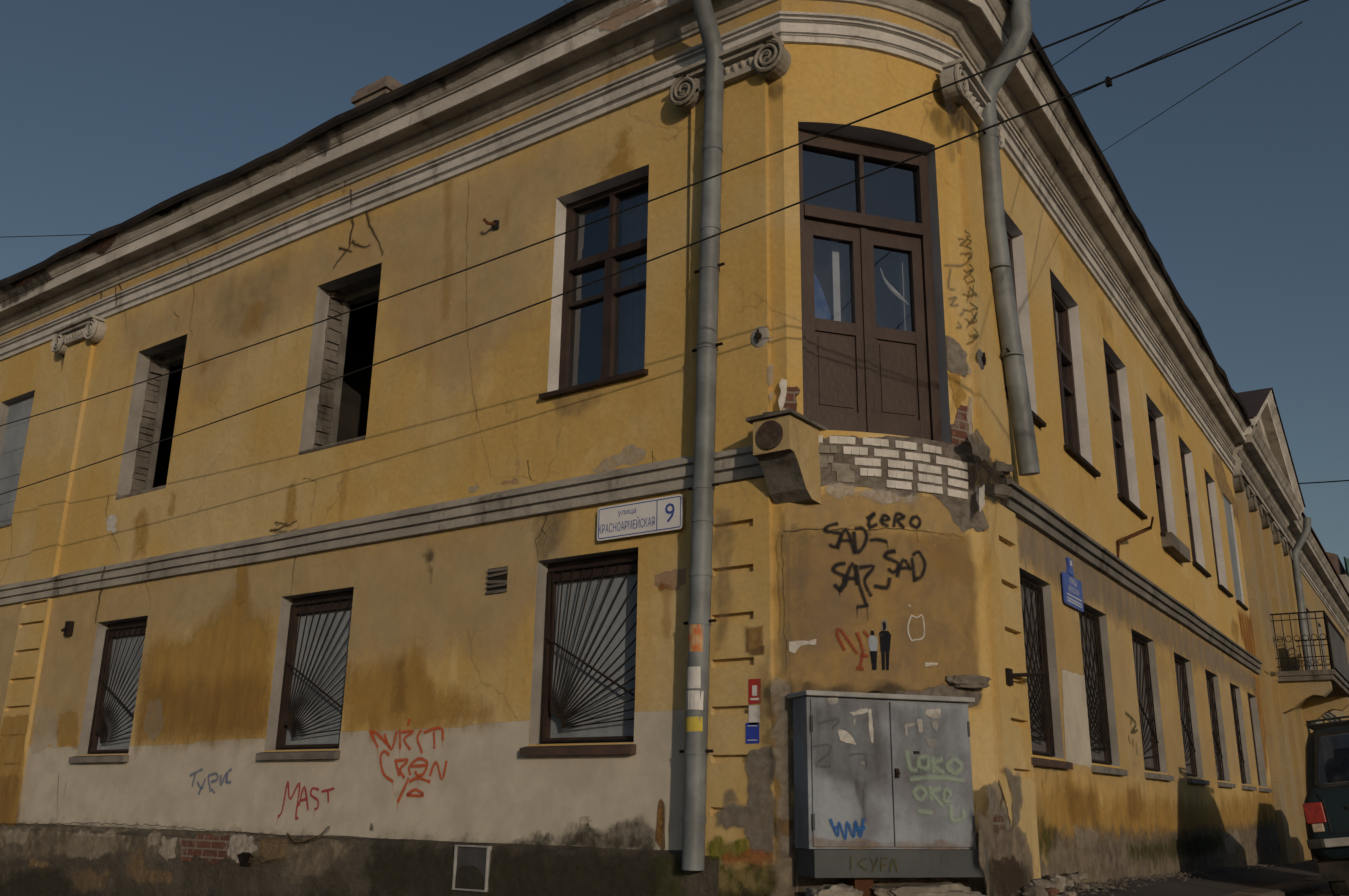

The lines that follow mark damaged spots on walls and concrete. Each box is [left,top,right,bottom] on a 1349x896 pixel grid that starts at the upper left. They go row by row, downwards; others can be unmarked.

crack [333,180,384,269]
flaking render [818,335,1013,532]
damp [138,565,270,742]
damp [351,655,487,729]
flaking render [987,768,1023,832]
spalling [0,824,310,891]
damp [772,842,845,896]
damp [873,809,1281,896]